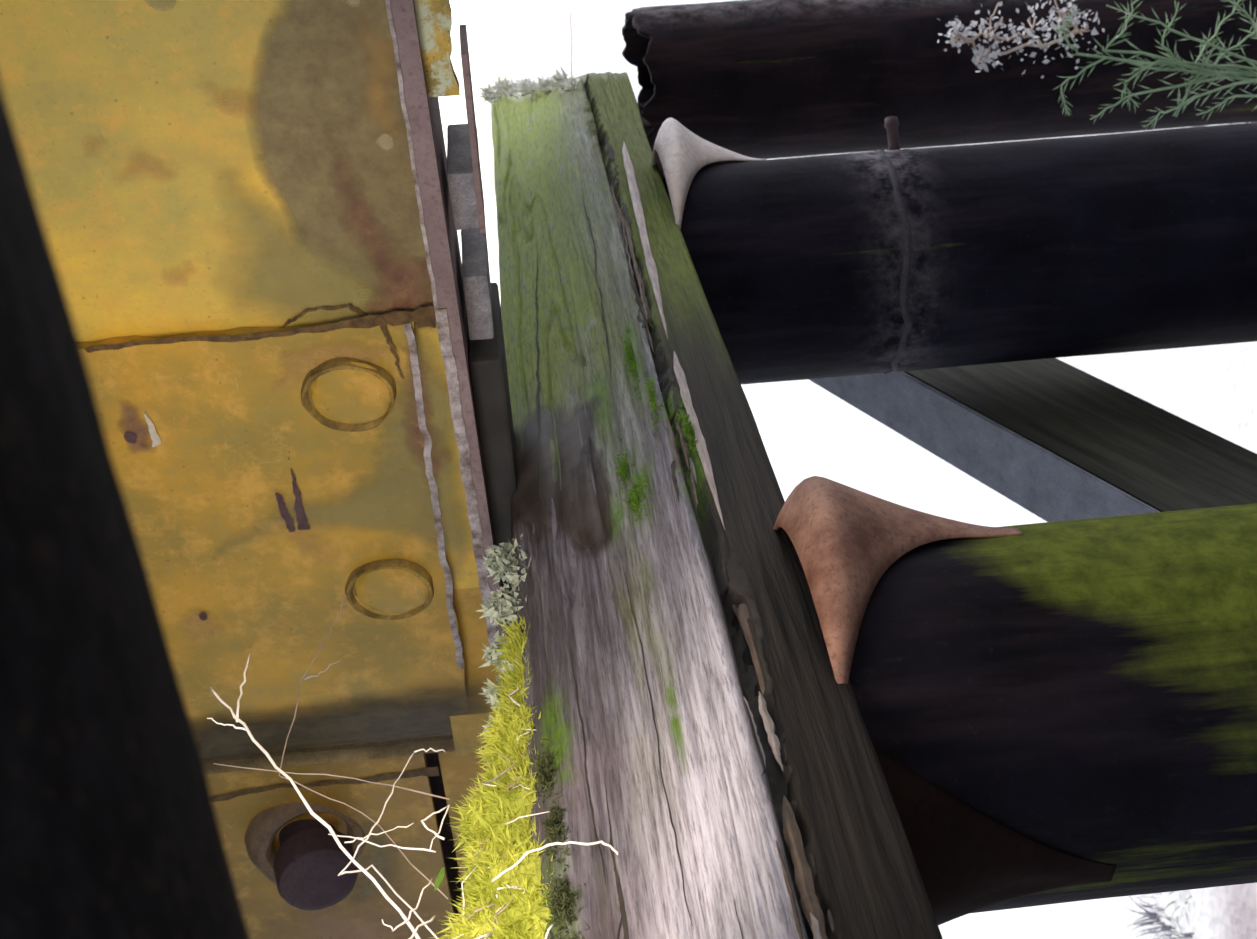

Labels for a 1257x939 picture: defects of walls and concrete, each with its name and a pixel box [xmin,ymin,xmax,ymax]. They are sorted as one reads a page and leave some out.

leakage [250,0,434,319]